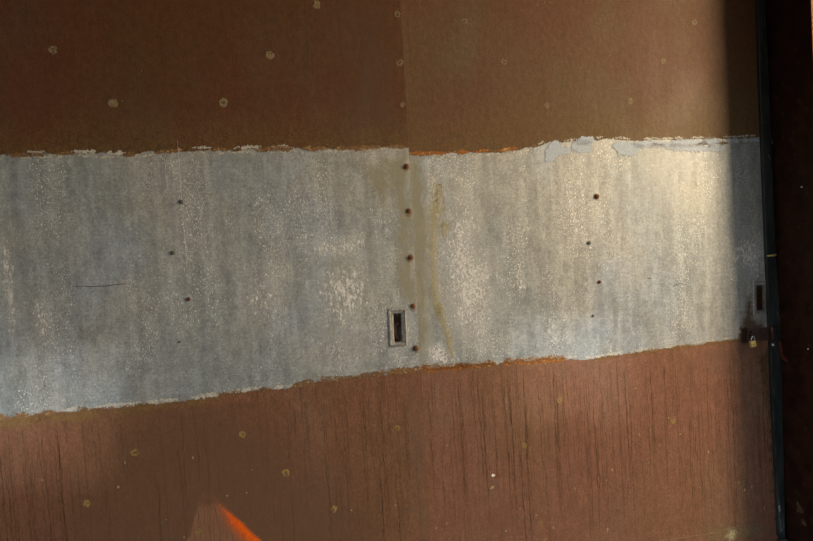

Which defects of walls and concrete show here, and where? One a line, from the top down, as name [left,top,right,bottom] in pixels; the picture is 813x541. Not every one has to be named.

peeling [20,149,126,159]
peeling [189,144,297,155]
rust [336,144,518,157]
peeling [509,136,602,162]
peeling [612,134,760,156]
rust [291,172,566,388]
rust [704,301,762,345]
peeling [470,351,623,365]
peeling [93,386,263,409]